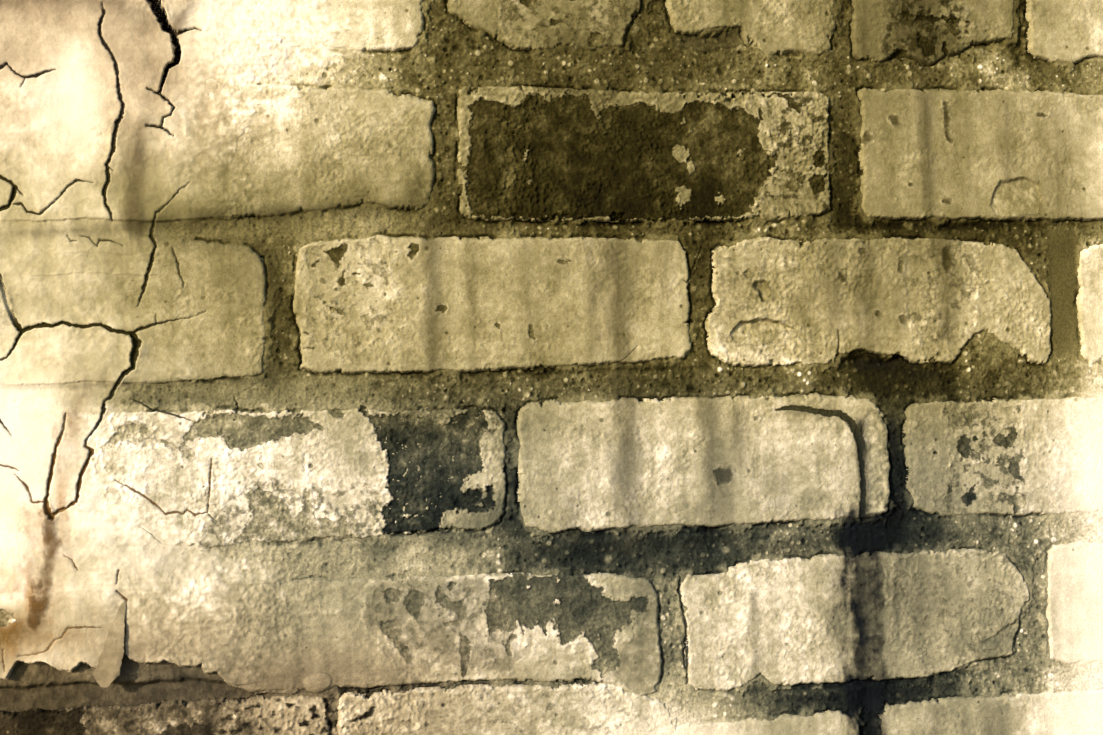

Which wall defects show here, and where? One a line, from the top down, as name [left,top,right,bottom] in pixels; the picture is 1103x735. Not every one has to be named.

crack [0,0,201,247]
peeling [465,92,830,224]
crack [0,184,191,520]
crack [120,397,239,540]
peeling [101,411,324,460]
peeling [201,405,503,550]
rust [0,511,57,650]
spalling [0,602,334,735]
peeling [351,706,375,722]
peeling [380,582,471,677]
peeling [483,568,648,683]
water stain [832,416,903,735]